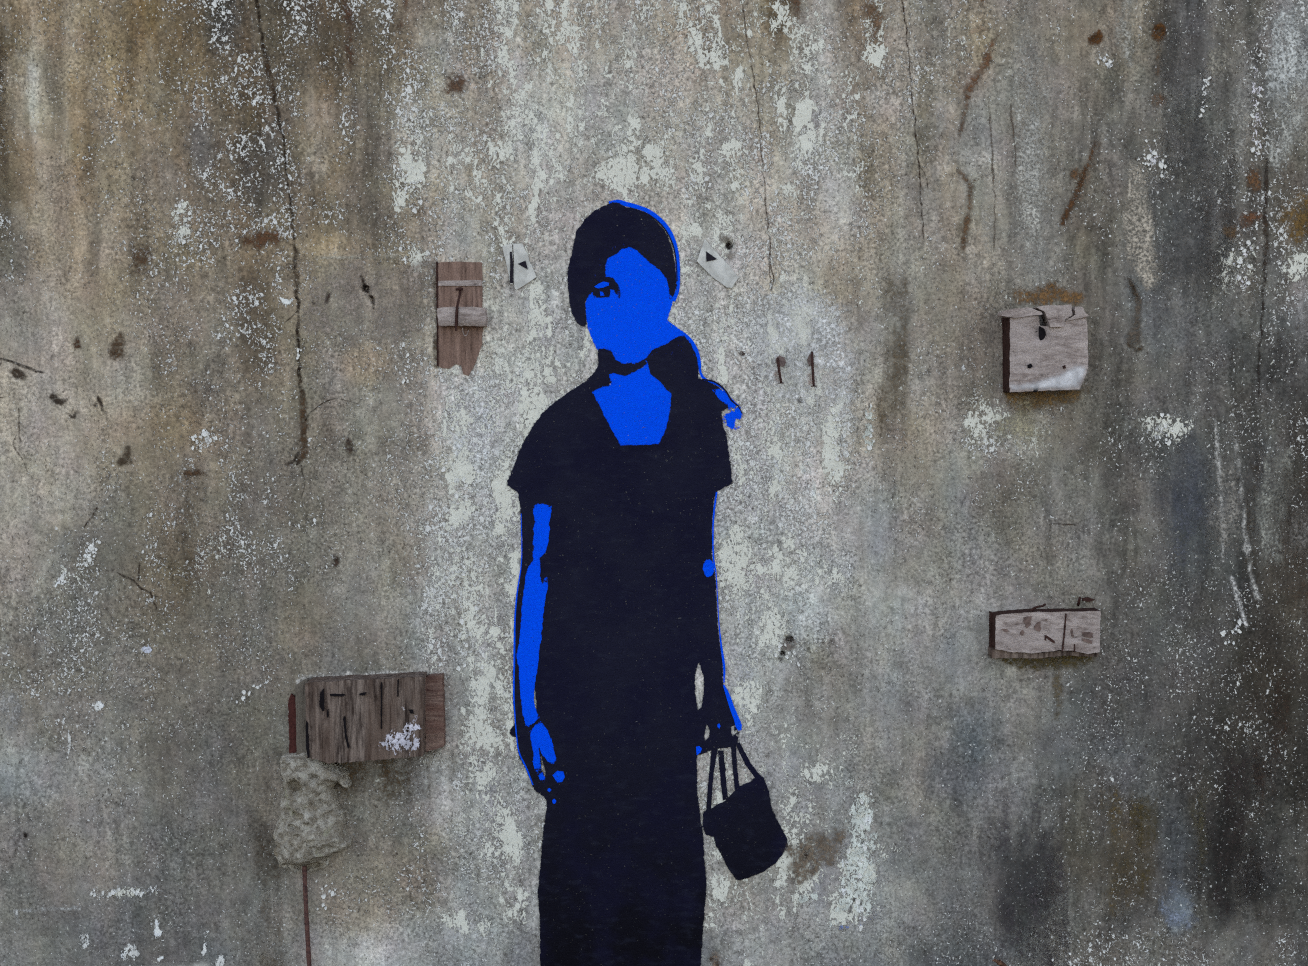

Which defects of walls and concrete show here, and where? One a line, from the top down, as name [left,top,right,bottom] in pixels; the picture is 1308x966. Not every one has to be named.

crack [255,0,357,494]
crack [740,0,774,290]
crack [901,0,928,236]
corrosion [959,172,975,248]
corrosion [958,26,994,136]
corrosion [1014,282,1082,305]
corrosion [1061,144,1099,226]